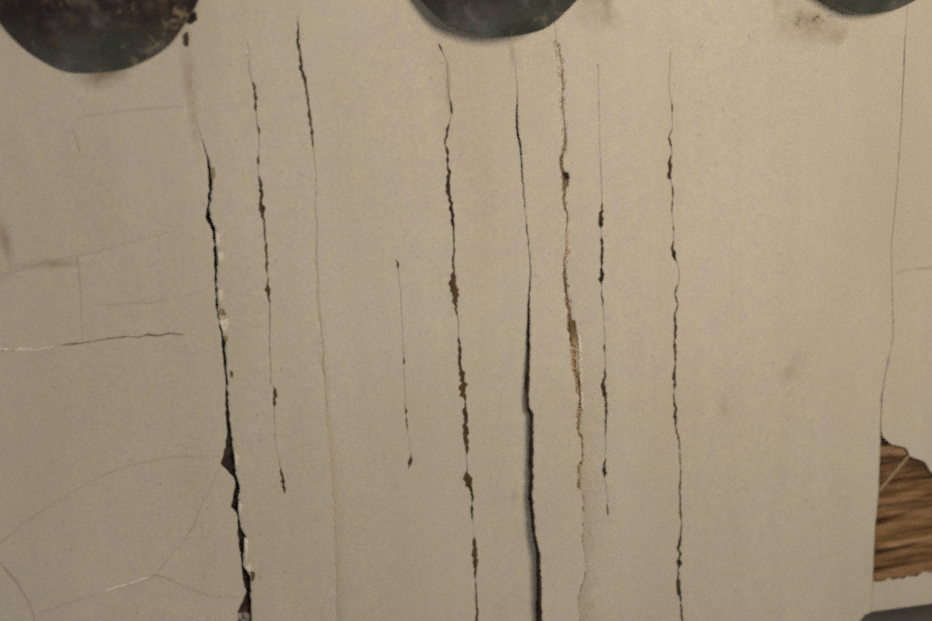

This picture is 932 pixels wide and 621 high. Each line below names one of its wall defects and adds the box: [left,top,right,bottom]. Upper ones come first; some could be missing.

rust [184,11,197,47]
crack [246,43,271,303]
crack [296,16,316,166]
crack [0,141,255,621]
crack [269,335,278,423]
crack [439,44,479,621]
crack [598,158,608,437]
crack [667,47,683,621]
crack [277,451,286,493]
crack [601,459,609,514]
peeling [871,436,932,612]